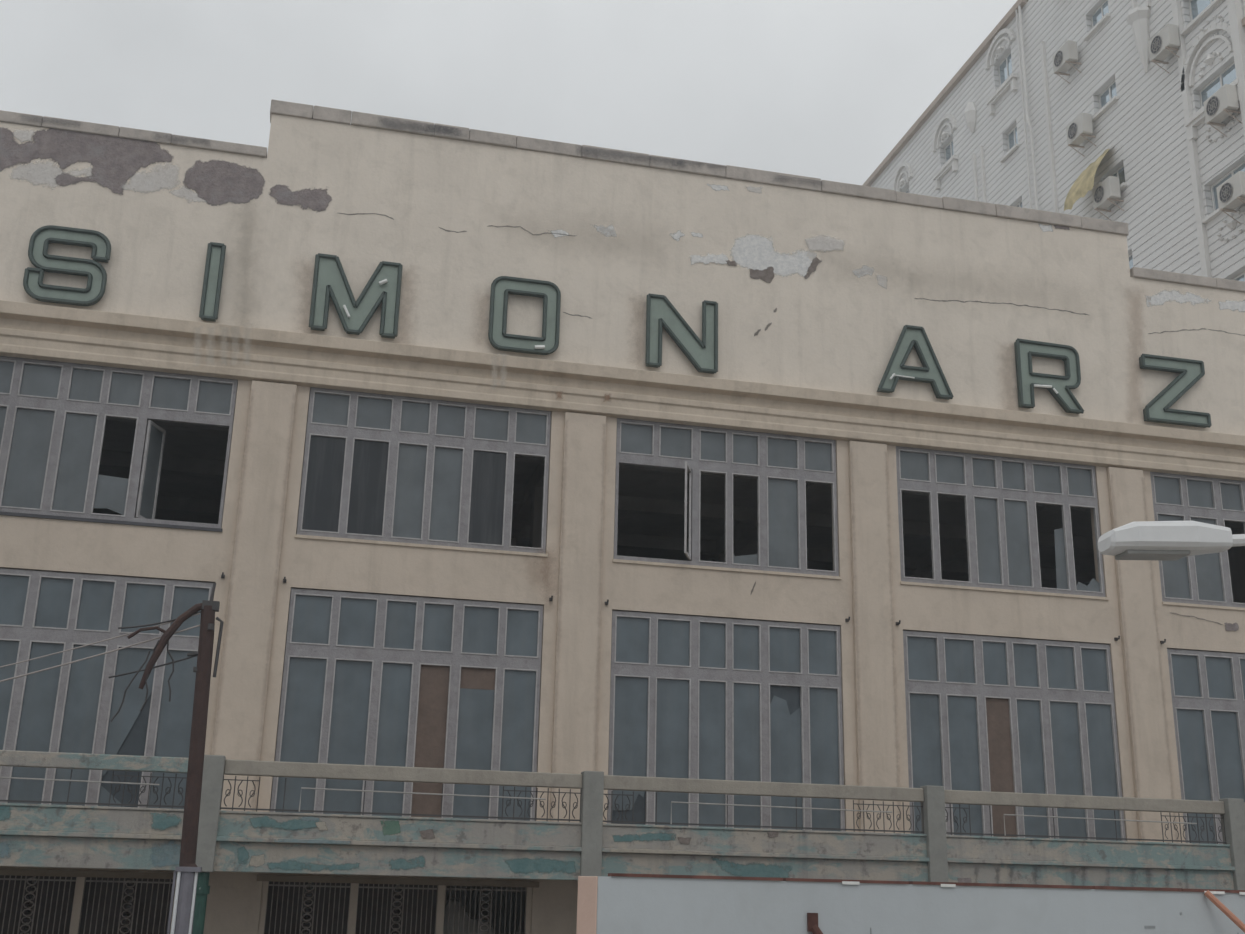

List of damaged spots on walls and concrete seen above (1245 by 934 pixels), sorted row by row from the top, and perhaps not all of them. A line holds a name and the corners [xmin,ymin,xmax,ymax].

spalling [0,127,332,212]
peeling [690,235,844,283]
peeling [150,813,181,867]